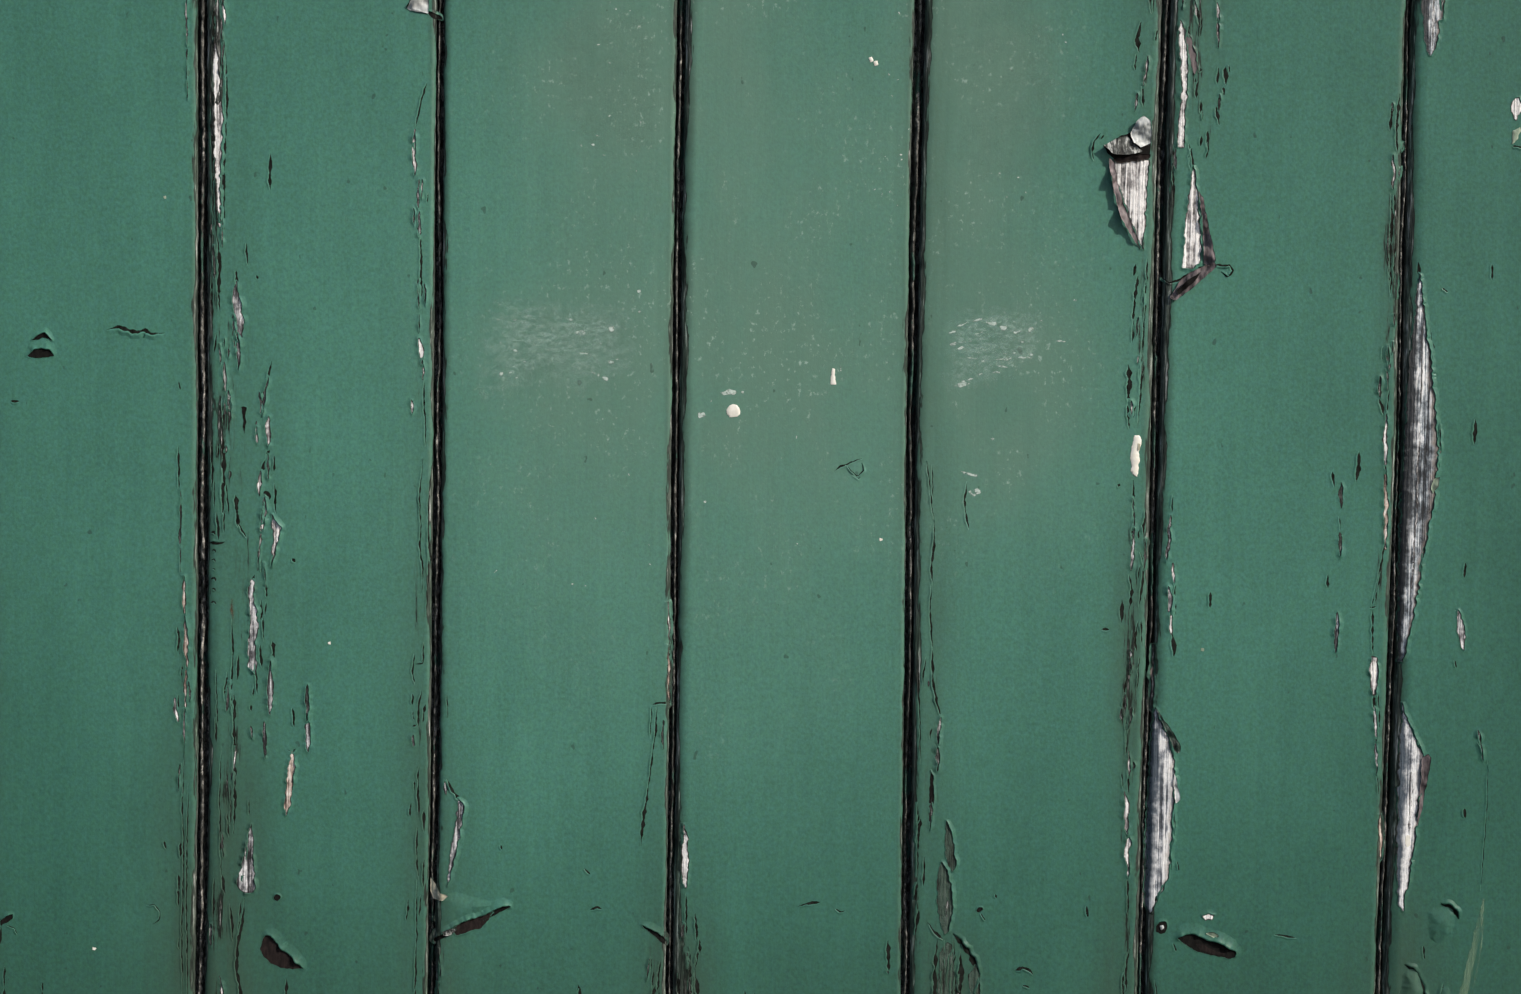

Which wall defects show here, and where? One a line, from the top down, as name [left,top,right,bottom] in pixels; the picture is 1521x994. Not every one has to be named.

peeling [1419,0,1449,58]
peeling [1088,0,1234,300]
peeling [208,0,316,818]
peeling [1116,480,1181,916]
peeling [1329,608,1344,656]
peeling [1323,451,1361,588]
peeling [1365,262,1444,914]
peeling [217,800,260,994]
peeling [260,928,308,972]
peeling [429,778,514,944]
peeling [1172,908,1242,960]